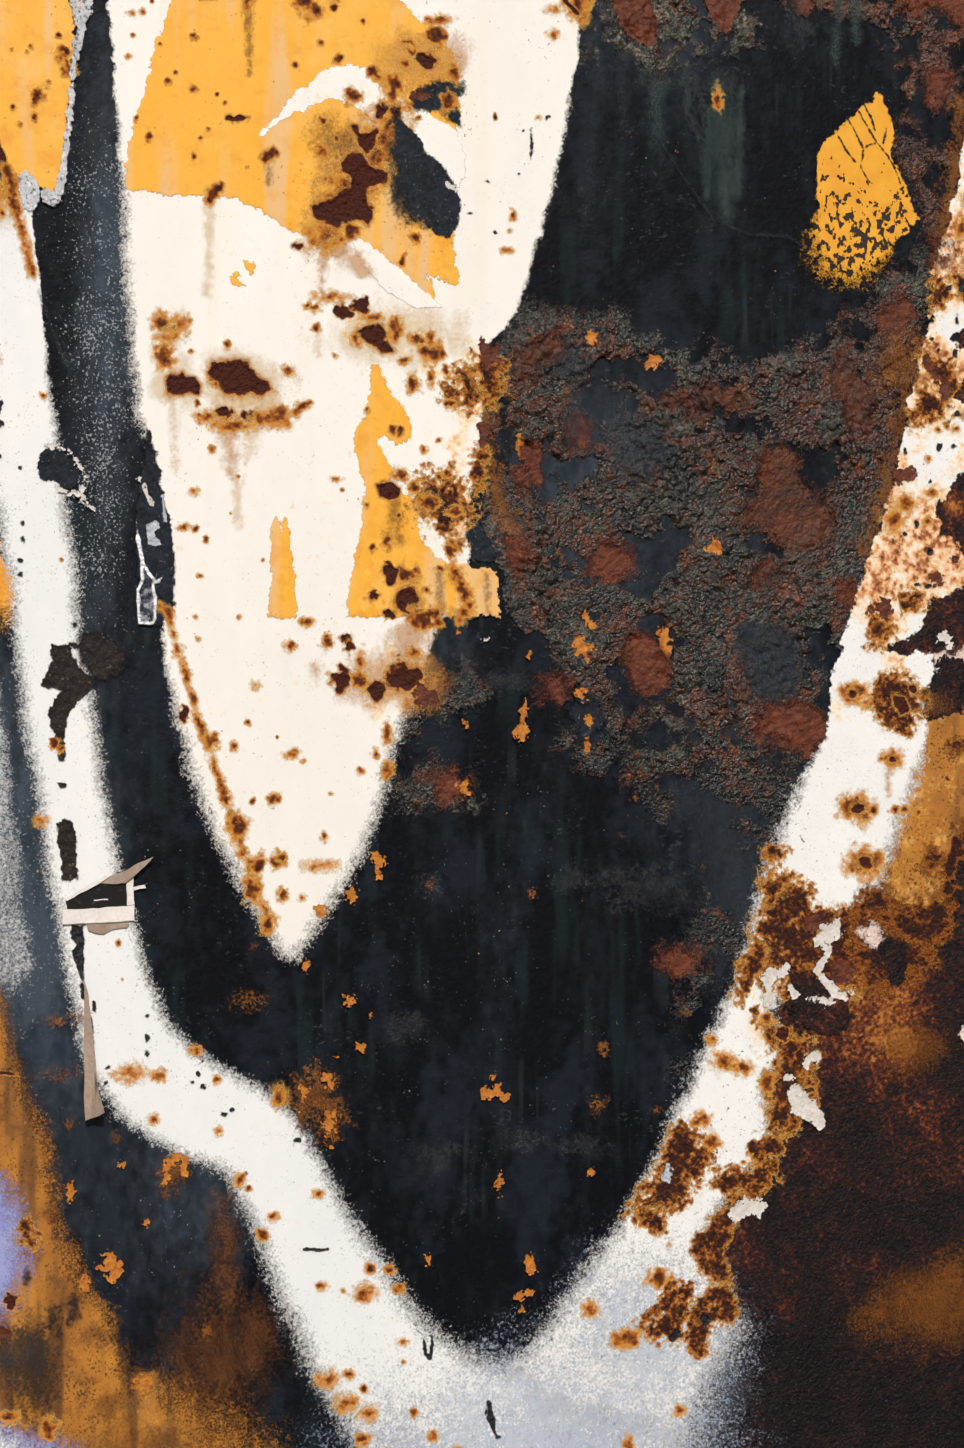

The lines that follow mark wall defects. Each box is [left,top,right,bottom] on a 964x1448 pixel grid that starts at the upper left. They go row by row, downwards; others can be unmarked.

rust [291,0,338,23]
rust [189,84,250,160]
peeling [124,0,466,309]
rust [291,15,461,259]
crack [838,103,901,184]
rust [151,308,314,453]
rust [177,523,209,543]
rust [838,196,964,769]
peeling [41,622,127,761]
rust [249,793,282,805]
rust [268,1058,351,1149]
rust [611,791,964,1448]